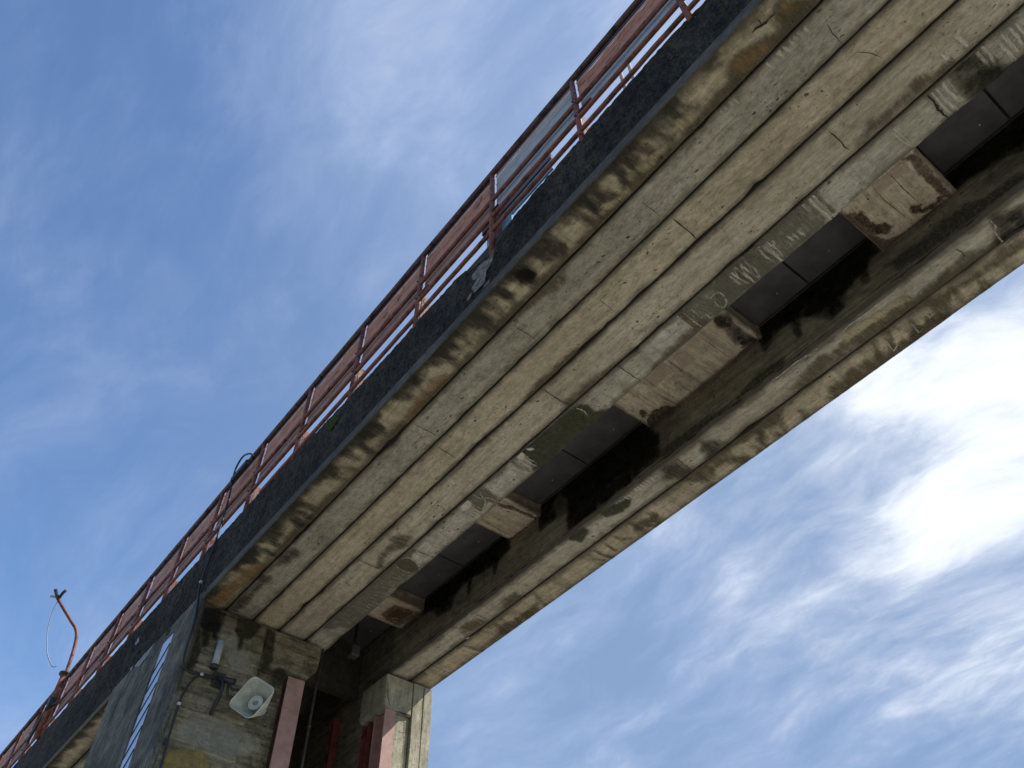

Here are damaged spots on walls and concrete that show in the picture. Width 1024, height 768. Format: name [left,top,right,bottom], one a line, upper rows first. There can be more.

crack [752,13,775,33]
water stain [233,233,566,572]
water stain [539,174,1024,542]
water stain [187,576,286,685]
corrosion [383,605,419,626]
water stain [422,537,510,616]